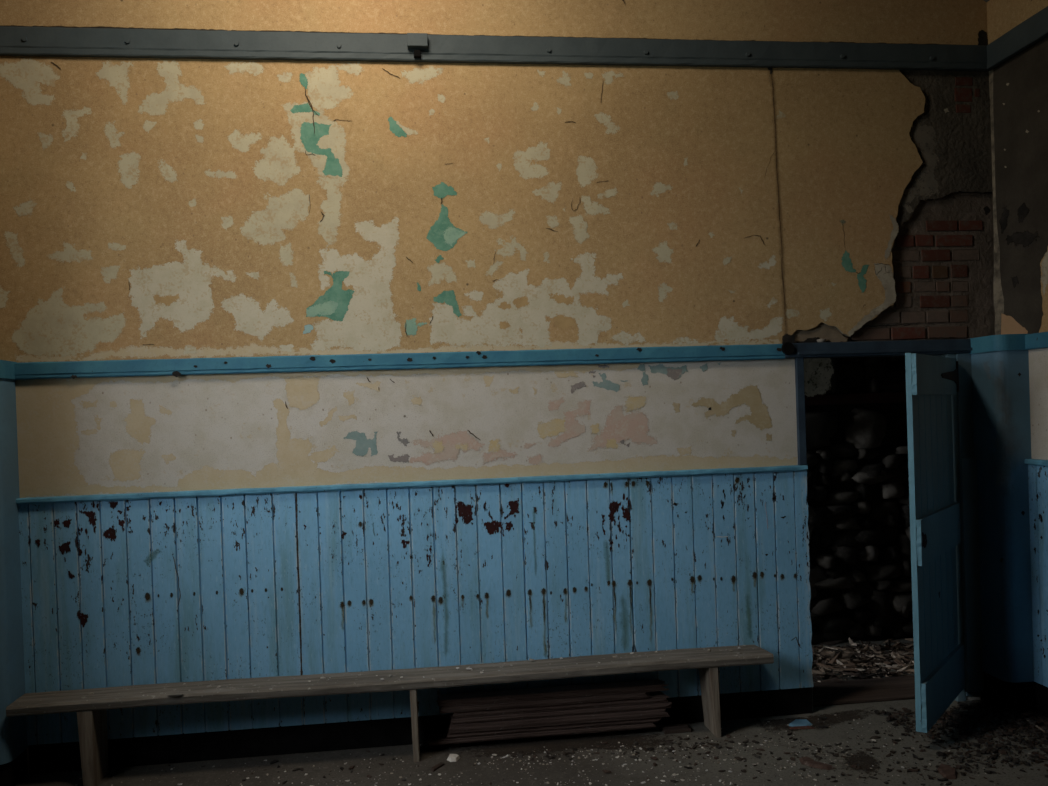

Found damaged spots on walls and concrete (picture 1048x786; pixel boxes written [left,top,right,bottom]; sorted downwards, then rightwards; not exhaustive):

spalling [0,36,1048,362]
crack [745,68,795,344]
peeling [284,376,321,410]
peeling [482,364,609,466]
peeling [19,483,189,556]
peeling [455,498,537,536]
peeling [602,482,631,552]
corrosion [528,583,593,650]
corrosion [607,579,652,635]